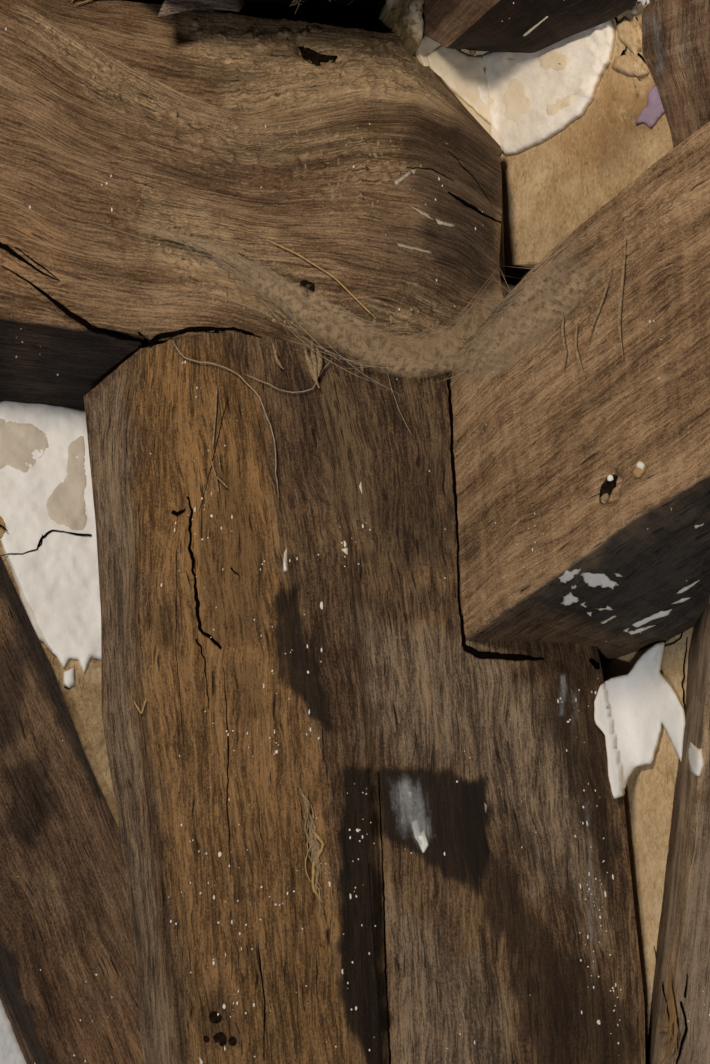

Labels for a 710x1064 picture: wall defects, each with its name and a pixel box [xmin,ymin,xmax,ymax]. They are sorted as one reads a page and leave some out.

flaking render [425,19,616,155]
peeling [636,85,665,128]
crack [0,242,262,348]
crack [1,530,92,556]
flaking render [0,401,101,688]
crack [171,402,231,875]
peeling [594,642,704,799]
leakage [338,767,635,1064]
crack [653,946,688,1064]